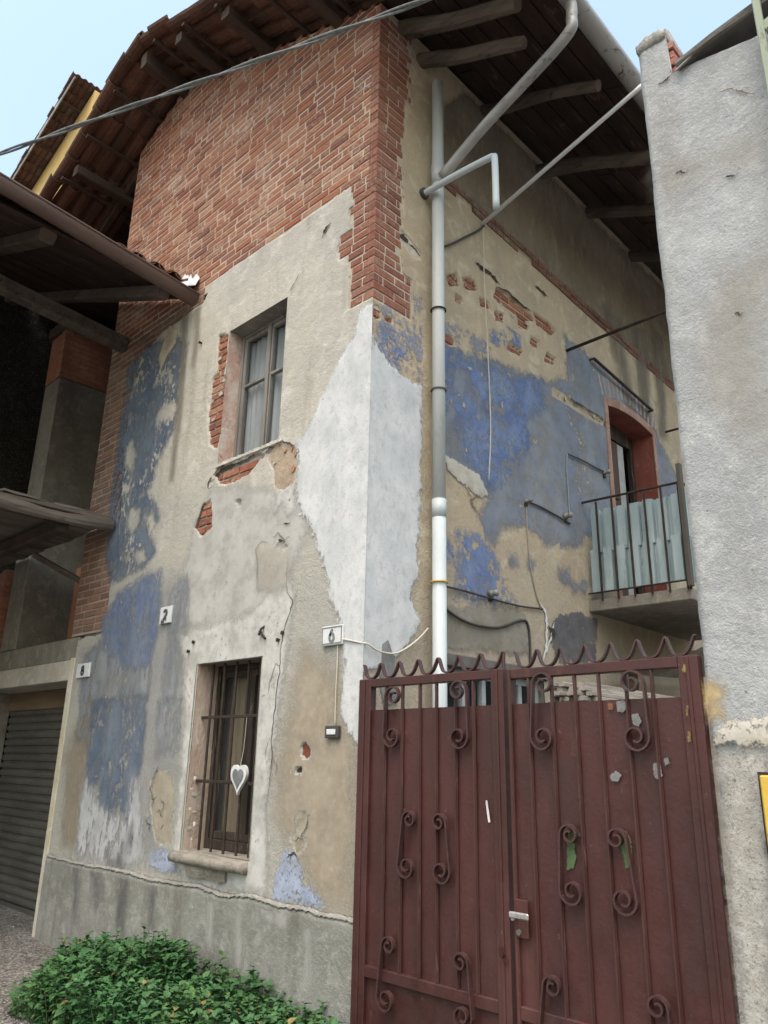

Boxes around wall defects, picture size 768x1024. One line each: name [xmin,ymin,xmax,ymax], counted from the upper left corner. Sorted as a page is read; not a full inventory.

peeling [445,274,677,609]
peeling [77,335,322,908]
crack [265,564,297,813]
peeling [549,611,598,665]